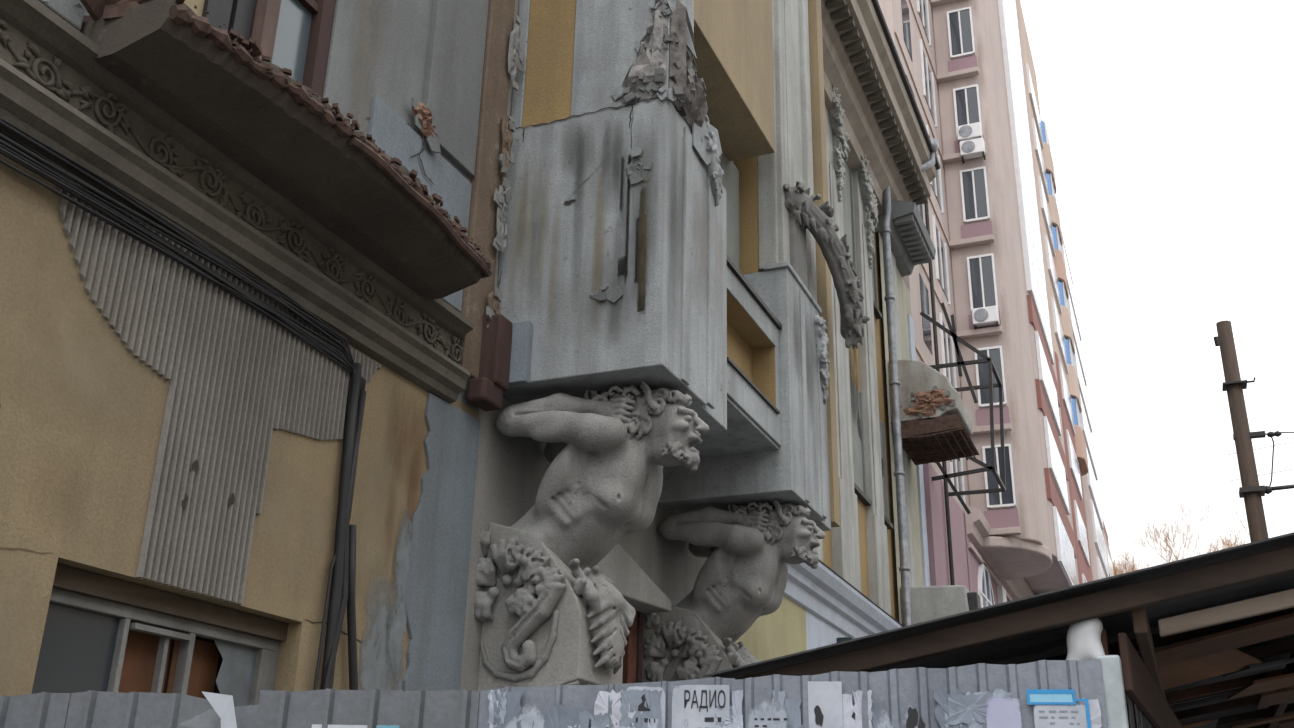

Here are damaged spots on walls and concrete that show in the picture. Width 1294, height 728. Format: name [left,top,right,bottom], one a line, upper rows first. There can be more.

spalling [411,98,441,153]
flaking render [493,116,516,255]
flaking render [508,15,526,90]
crack [516,97,659,201]
spalling [611,0,722,165]
flaking render [486,284,503,328]
crack [0,546,50,554]
peeling [359,518,413,691]